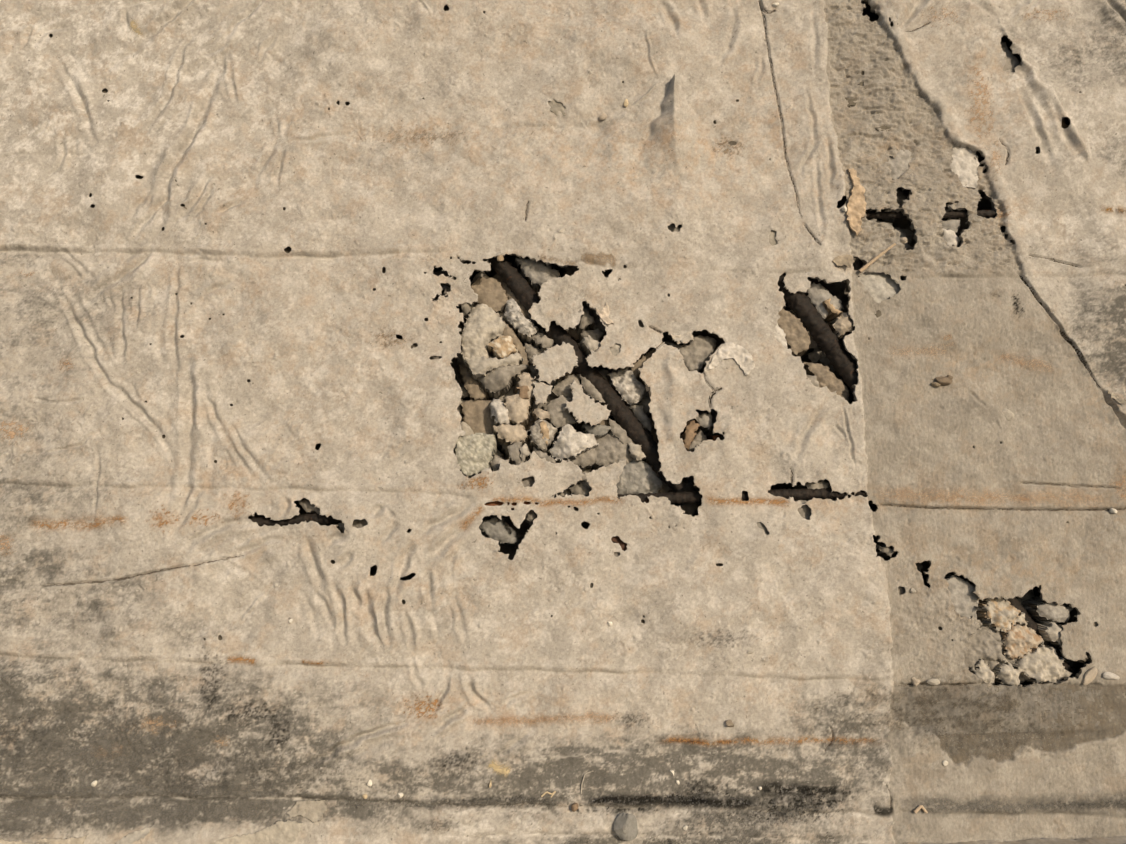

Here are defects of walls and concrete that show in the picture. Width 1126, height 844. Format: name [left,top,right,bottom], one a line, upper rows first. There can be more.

crack [759,3,819,243]
spalling [865,149,917,250]
spalling [950,146,980,189]
spalling [941,201,1015,247]
spalling [774,254,901,404]
crack [1019,255,1100,387]
spalling [432,253,755,517]
spalling [248,498,368,533]
spalling [768,480,867,519]
crack [879,482,1125,511]
spalling [944,572,1092,687]
leakage [867,678,1126,765]